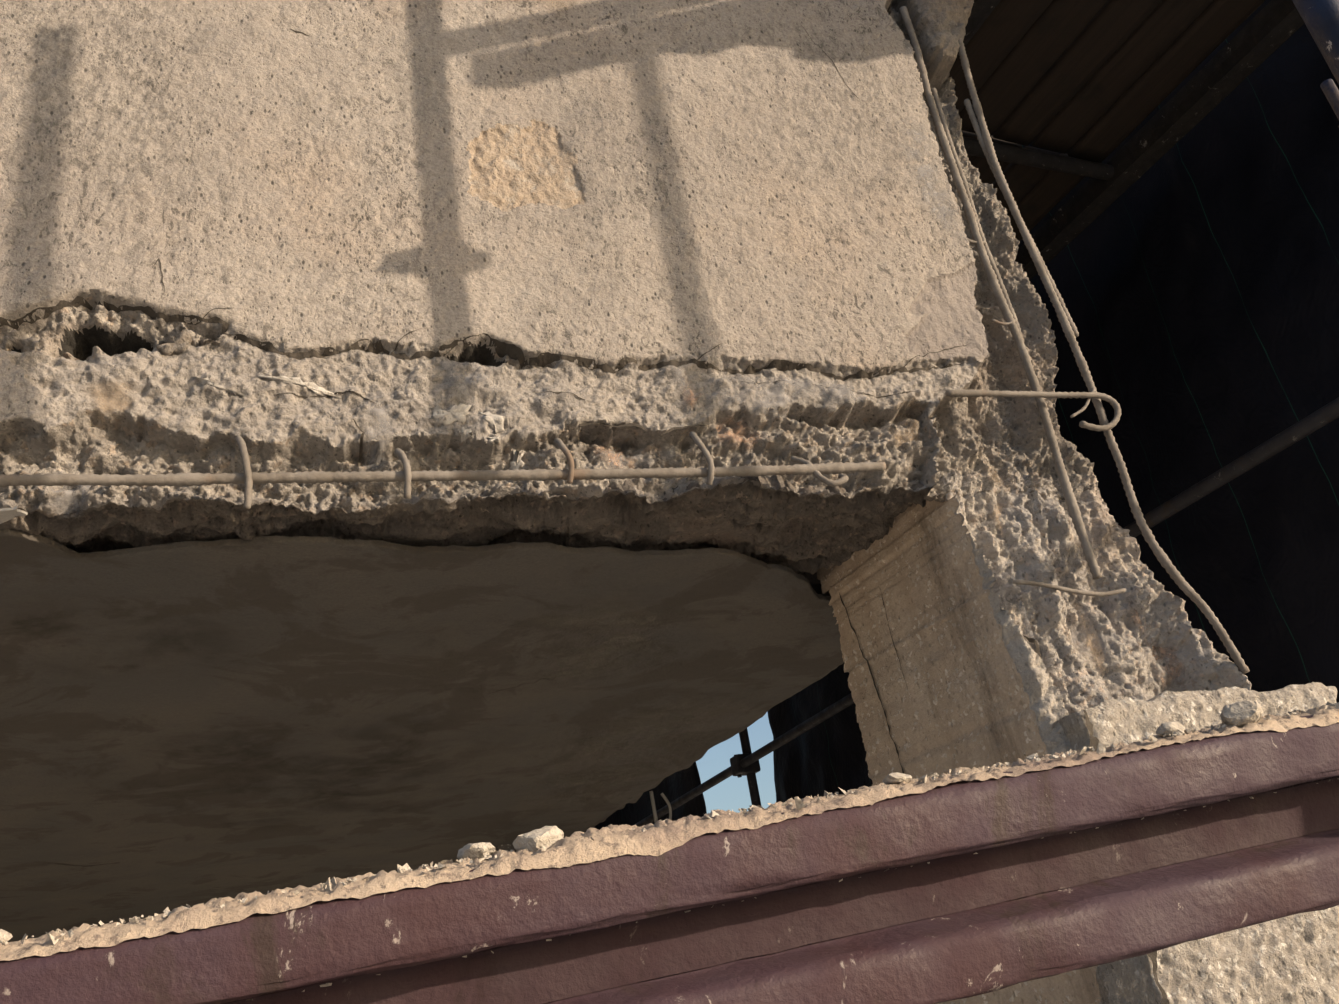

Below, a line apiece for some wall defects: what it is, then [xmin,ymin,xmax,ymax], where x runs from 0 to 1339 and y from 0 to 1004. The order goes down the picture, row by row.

crack [0,258,967,381]
flaking render [0,0,1252,755]